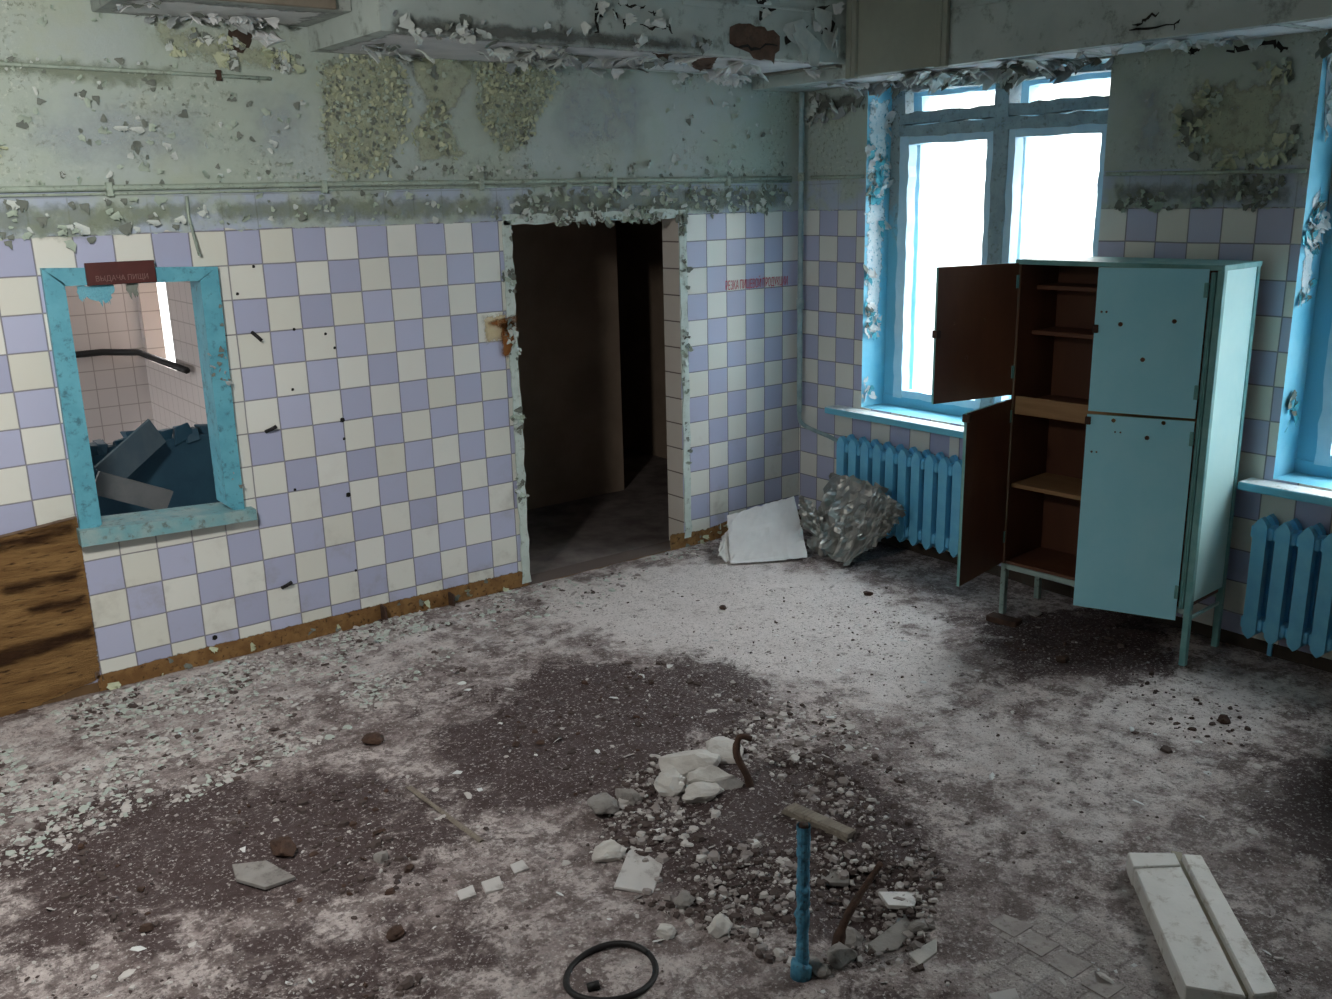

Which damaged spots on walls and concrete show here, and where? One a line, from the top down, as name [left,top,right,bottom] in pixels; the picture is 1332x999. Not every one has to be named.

peeling [0,53,306,253]
peeling [505,318,522,361]
peeling [680,327,693,394]
peeling [0,516,528,717]